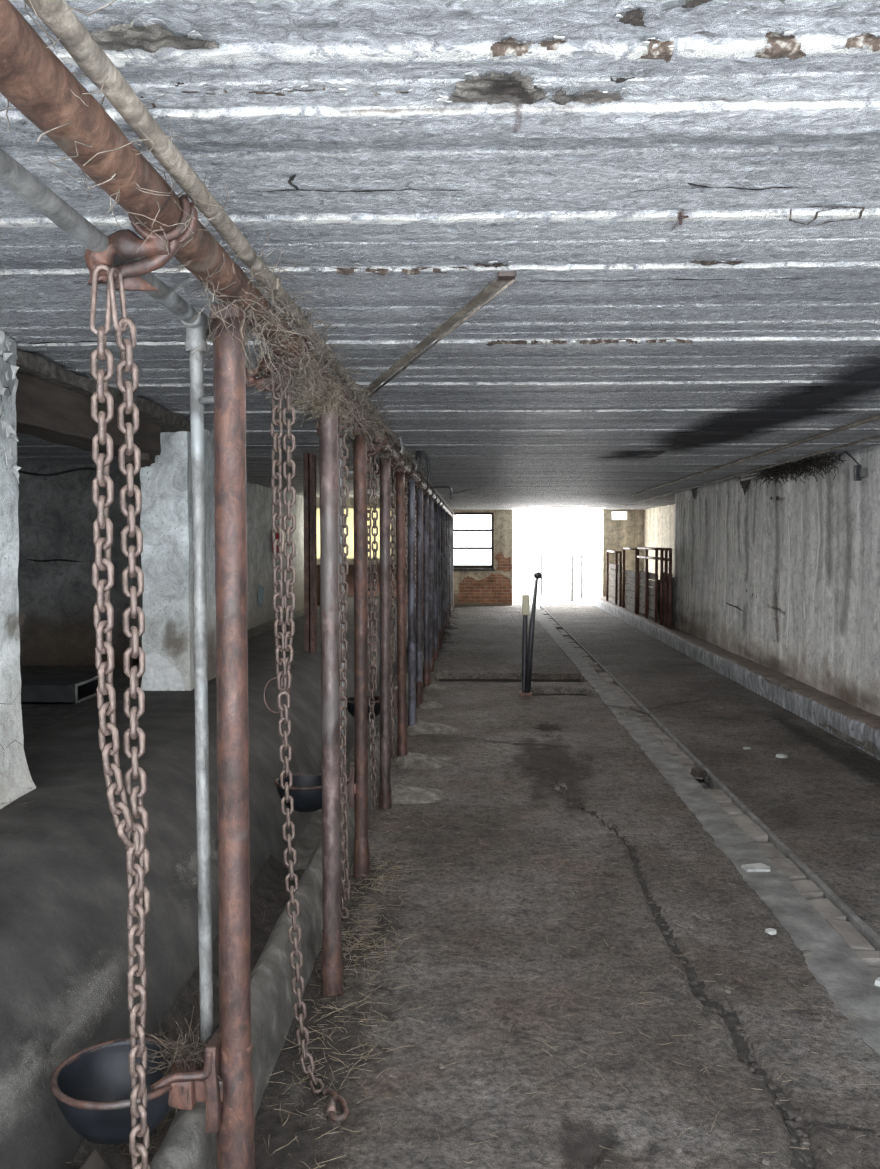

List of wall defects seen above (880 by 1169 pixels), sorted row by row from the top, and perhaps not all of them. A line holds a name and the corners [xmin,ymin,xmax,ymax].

spalling [91,19,219,53]
peeling [490,36,569,58]
peeling [616,4,674,63]
peeling [755,31,806,61]
peeling [845,33,880,52]
spalling [437,70,635,105]
crack [633,182,865,225]
peeling [0,331,22,484]
flaking render [458,552,512,604]
crack [464,737,880,1169]